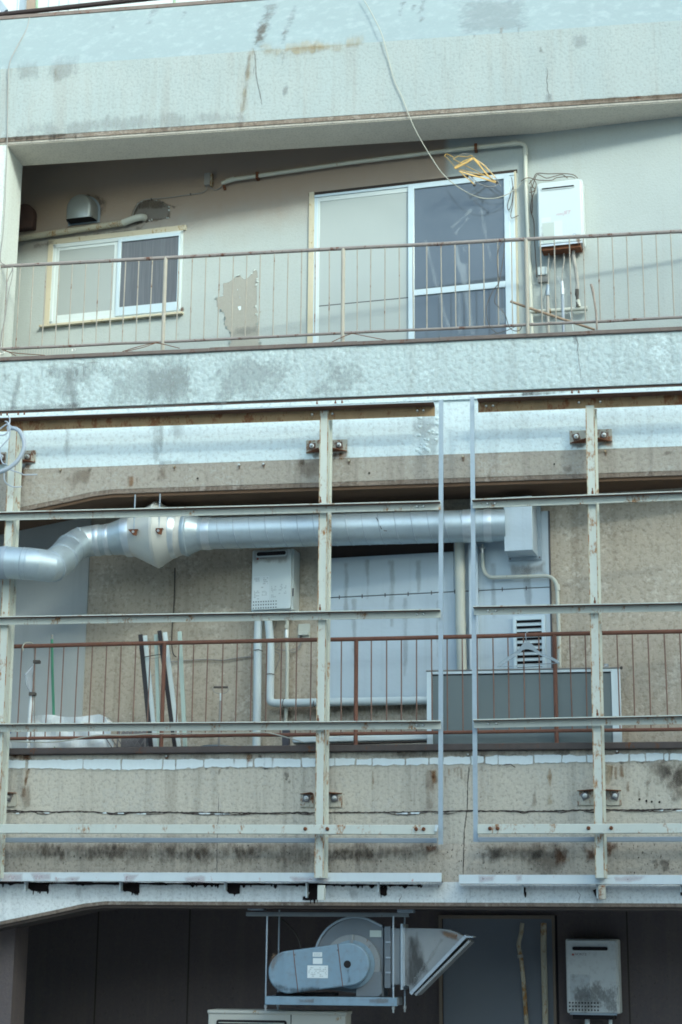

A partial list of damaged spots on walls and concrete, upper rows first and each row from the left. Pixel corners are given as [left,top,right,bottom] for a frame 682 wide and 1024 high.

peeling [215,269,261,347]
crack [7,769,682,867]